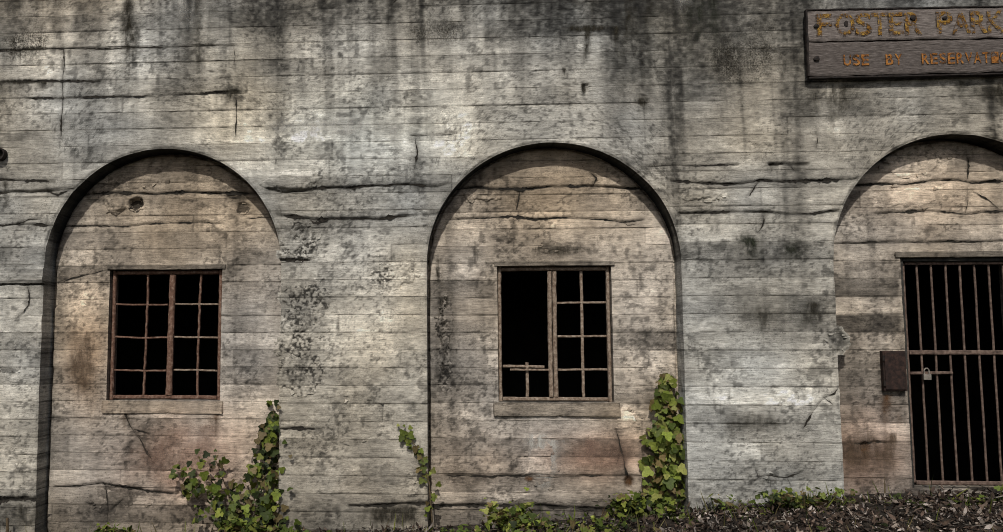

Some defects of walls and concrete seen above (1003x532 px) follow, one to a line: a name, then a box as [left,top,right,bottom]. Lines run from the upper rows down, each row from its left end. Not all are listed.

water stain [5,23,48,59]
water stain [124,0,136,51]
water stain [570,11,631,56]
crack [0,45,237,134]
crack [804,390,837,427]
crack [124,413,152,459]